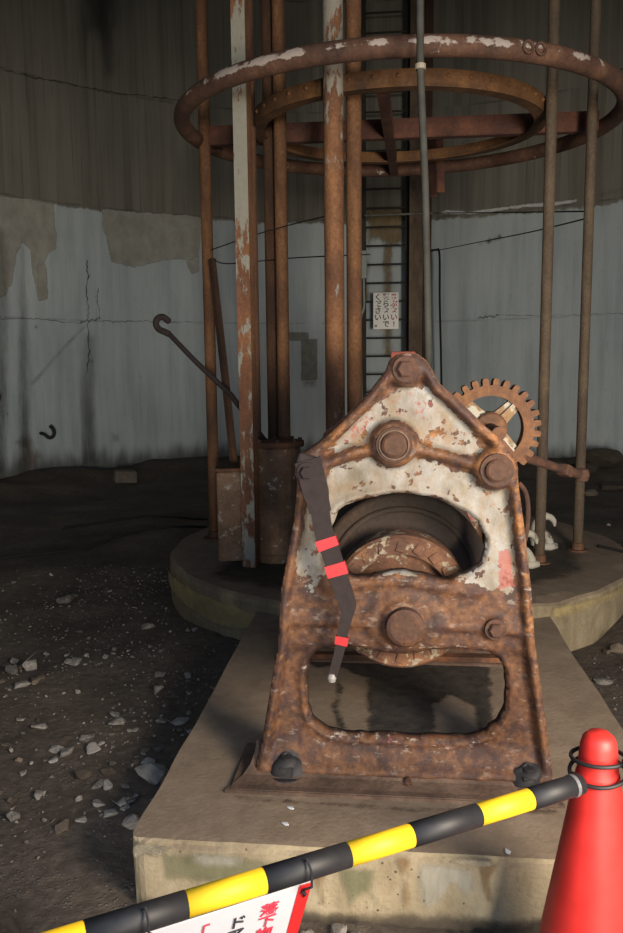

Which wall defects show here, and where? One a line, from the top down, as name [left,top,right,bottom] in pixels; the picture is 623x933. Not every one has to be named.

peeling [0,196,57,301]
peeling [102,209,201,274]
crack [0,260,188,373]